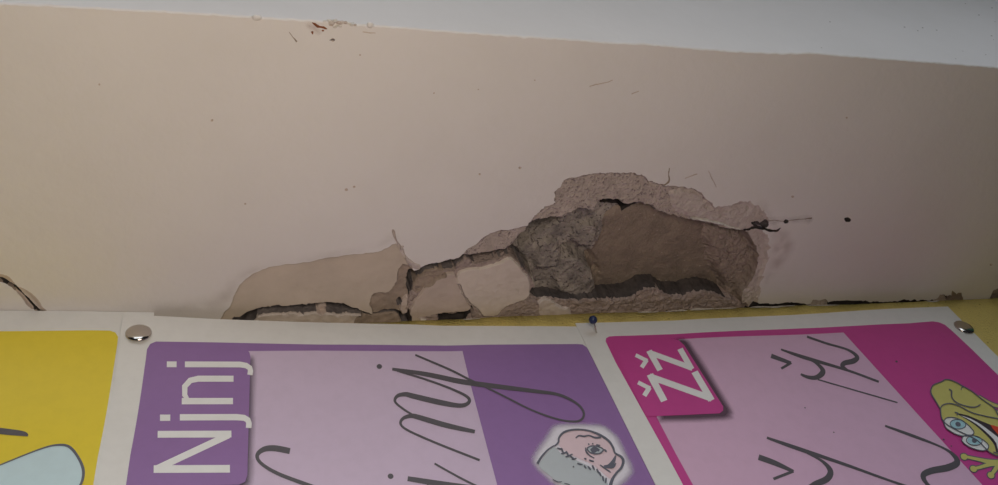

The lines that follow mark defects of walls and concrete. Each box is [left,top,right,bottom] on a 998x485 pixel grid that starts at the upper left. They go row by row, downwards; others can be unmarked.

spalling [221,243,421,323]
spalling [498,172,795,324]